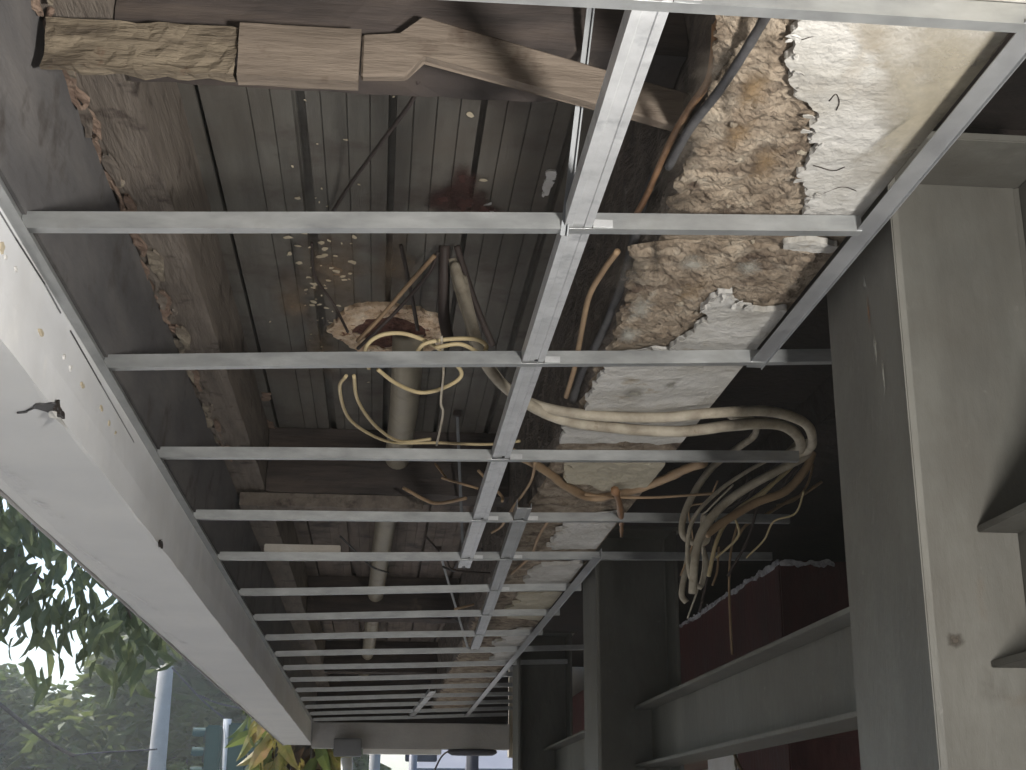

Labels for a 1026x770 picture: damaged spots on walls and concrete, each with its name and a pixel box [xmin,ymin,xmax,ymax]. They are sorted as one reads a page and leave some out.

spalling [666,15,824,215]
spalling [283,233,441,352]
spalling [612,238,827,351]